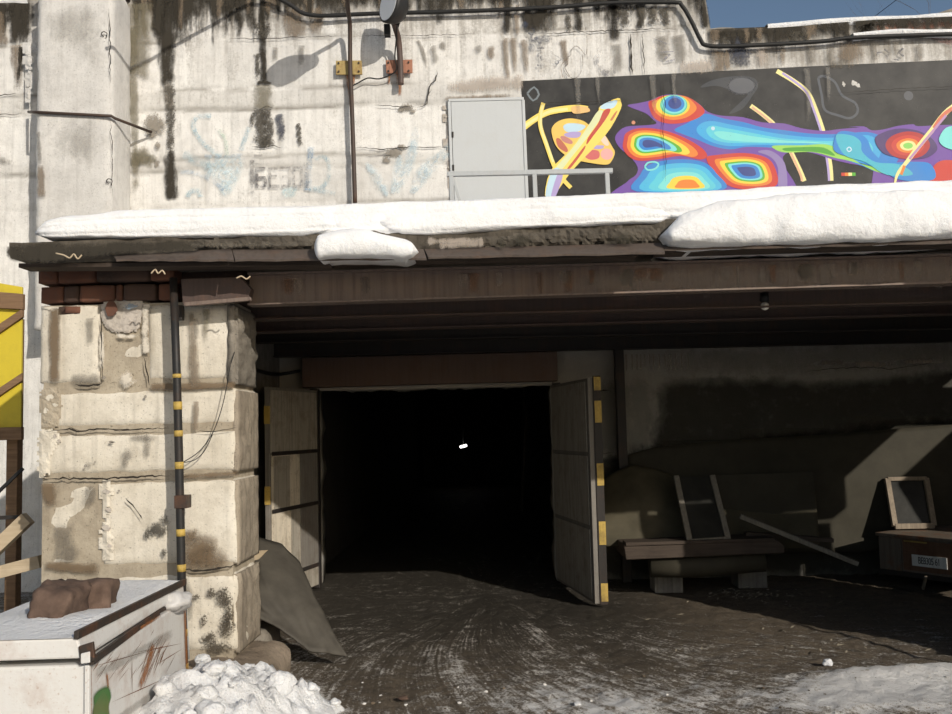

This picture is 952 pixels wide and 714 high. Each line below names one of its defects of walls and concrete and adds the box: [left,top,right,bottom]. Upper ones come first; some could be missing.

leakage [0,2,34,80]
leakage [130,0,381,199]
crack [380,73,438,107]
leakage [408,0,670,100]
leakage [659,0,952,72]
spalling [99,299,150,379]
peeling [120,373,134,388]
spalling [37,387,63,478]